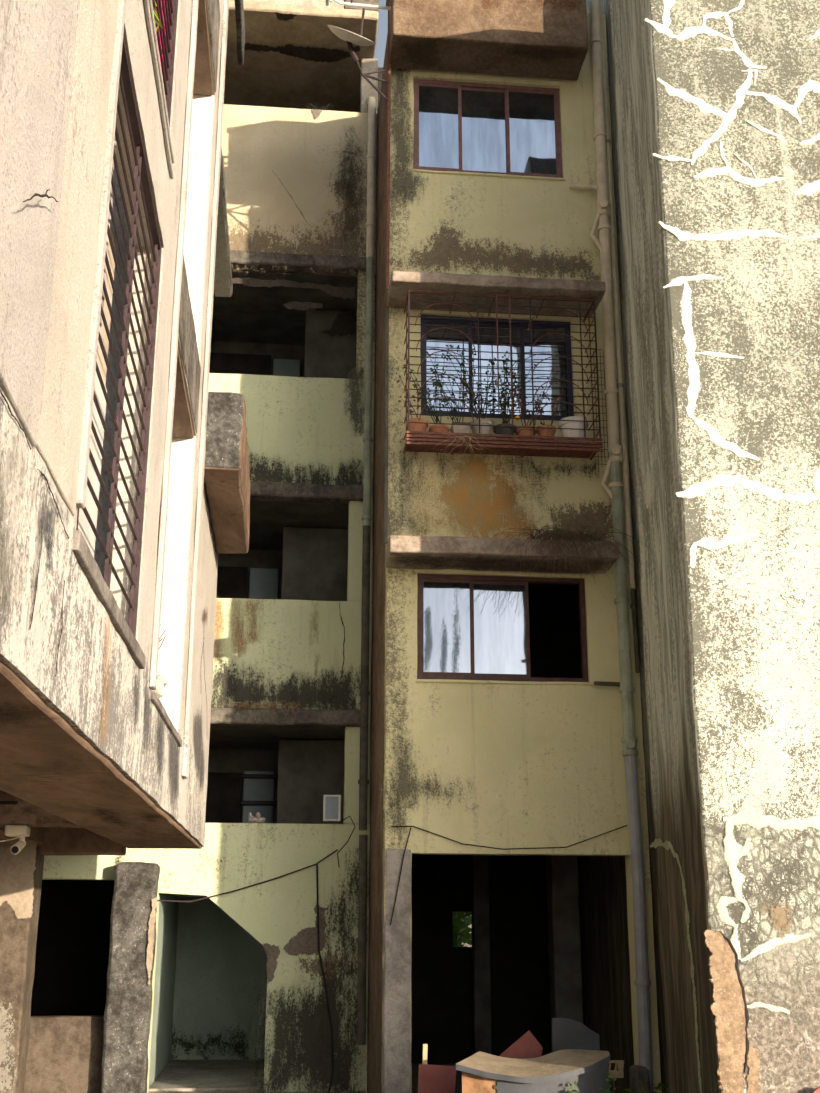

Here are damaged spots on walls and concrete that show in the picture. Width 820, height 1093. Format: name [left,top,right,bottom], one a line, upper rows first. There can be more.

crack [645,0,820,196]
crack [22,189,59,202]
damp [389,220,600,281]
crack [659,221,820,241]
crack [663,274,820,505]
damp [249,453,364,485]
damp [134,669,180,805]
damp [194,658,361,790]
peeling [0,840,38,919]
mould [171,848,369,1093]
peeling [263,905,327,982]
spalling [704,929,761,1093]